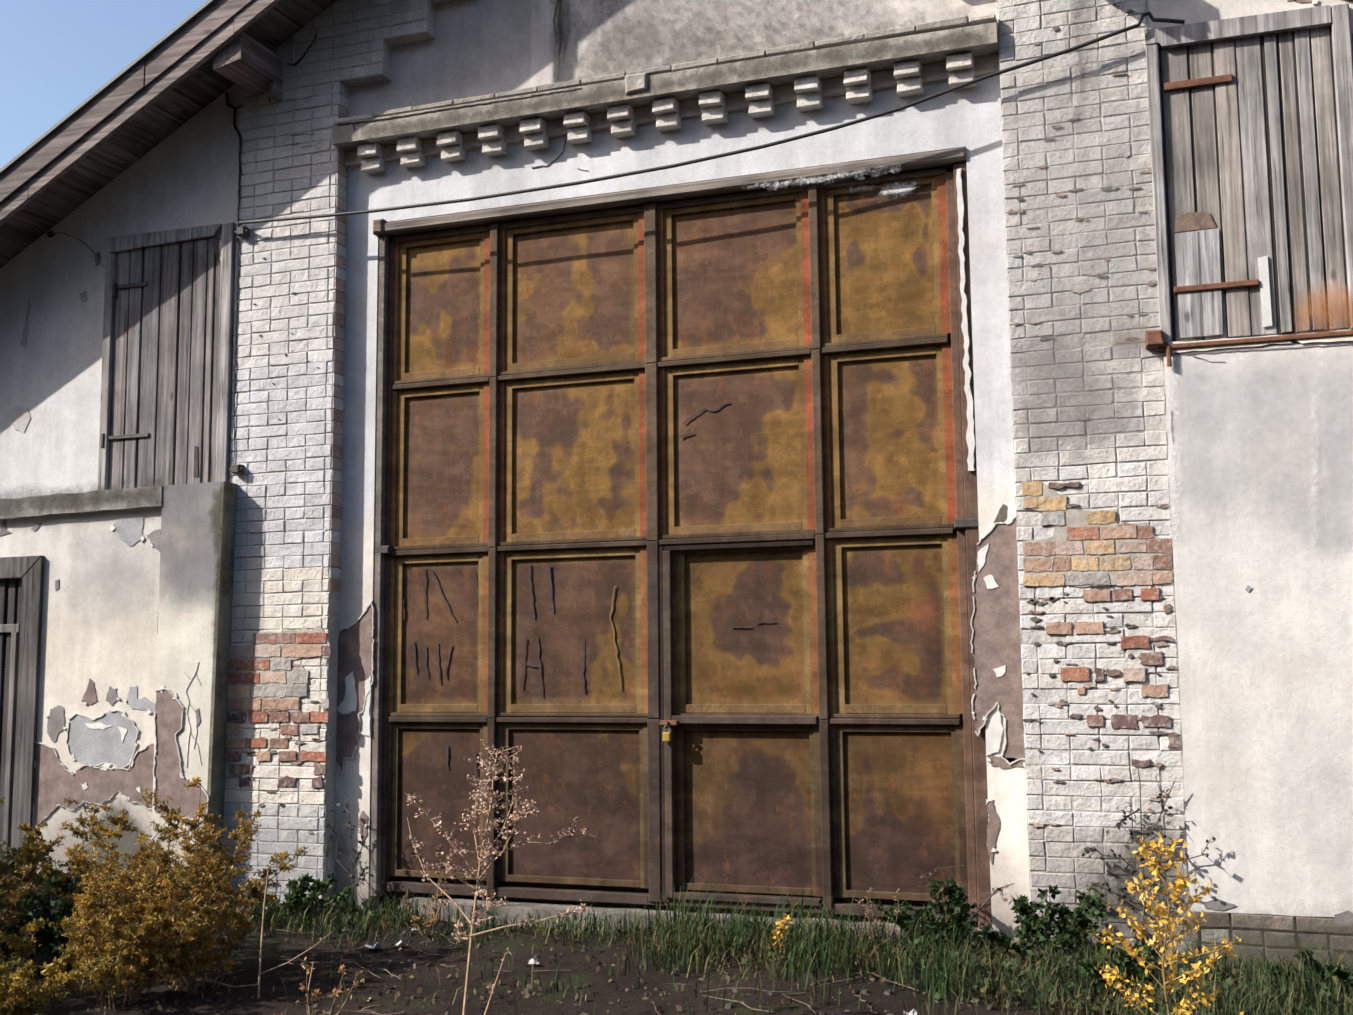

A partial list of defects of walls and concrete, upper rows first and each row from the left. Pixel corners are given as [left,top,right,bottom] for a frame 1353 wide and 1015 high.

crack [290,0,581,148]
peeling [1007,184,1039,229]
peeling [1101,169,1152,191]
peeling [1012,250,1063,281]
flaking render [110,516,161,551]
flaking render [970,480,1180,769]
flaking render [225,601,375,807]
flaking render [32,678,225,830]
flaking render [986,799,1000,863]